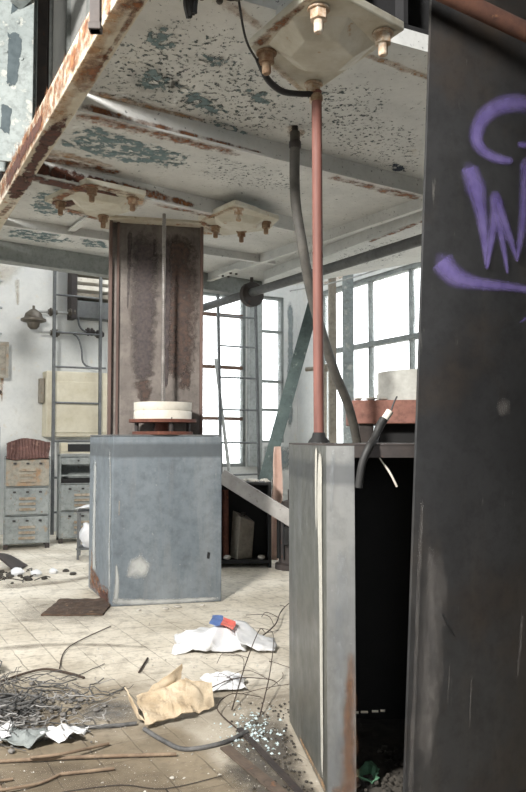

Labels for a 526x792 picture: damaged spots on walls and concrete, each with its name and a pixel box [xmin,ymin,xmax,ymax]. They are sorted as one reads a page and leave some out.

rust [254,1,305,46]
peeling [96,19,312,138]
rust [0,0,260,235]
peeling [59,123,191,170]
peeling [29,189,75,218]